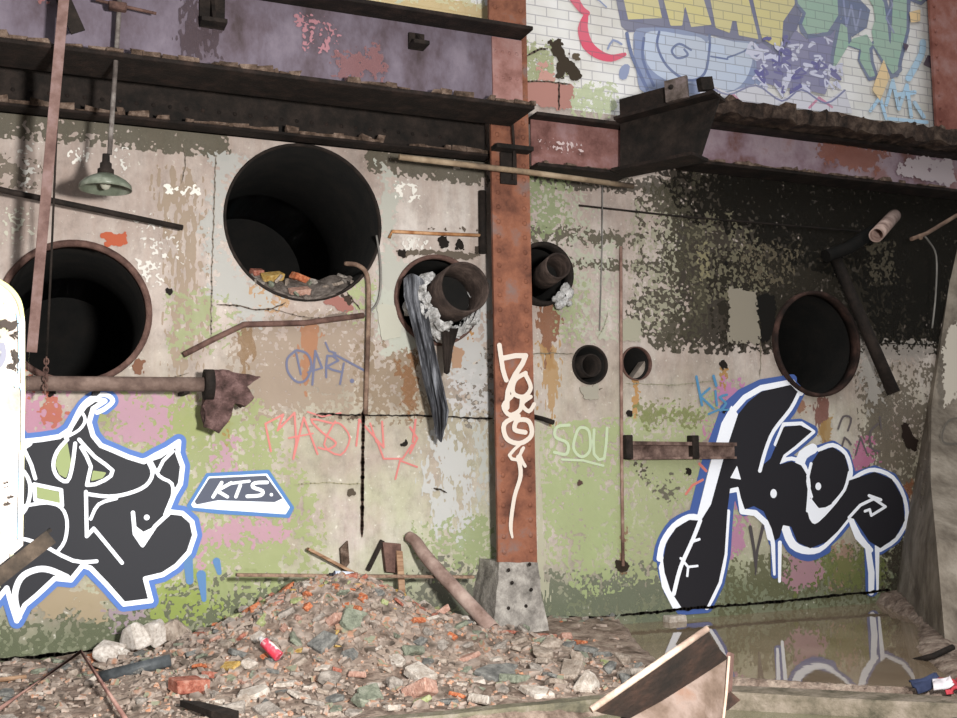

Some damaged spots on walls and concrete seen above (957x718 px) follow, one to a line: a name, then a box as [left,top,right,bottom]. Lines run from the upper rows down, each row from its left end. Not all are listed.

rust [0,29,51,44]
rust [329,40,411,90]
rust [431,88,474,98]
peeling [17,139,40,192]
peeling [67,147,93,167]
peeling [163,184,201,196]
rust [815,143,892,177]
spalling [100,232,128,247]
peeling [129,210,190,287]
spalling [755,293,777,342]
rust [533,304,564,428]
water stain [712,533,905,616]